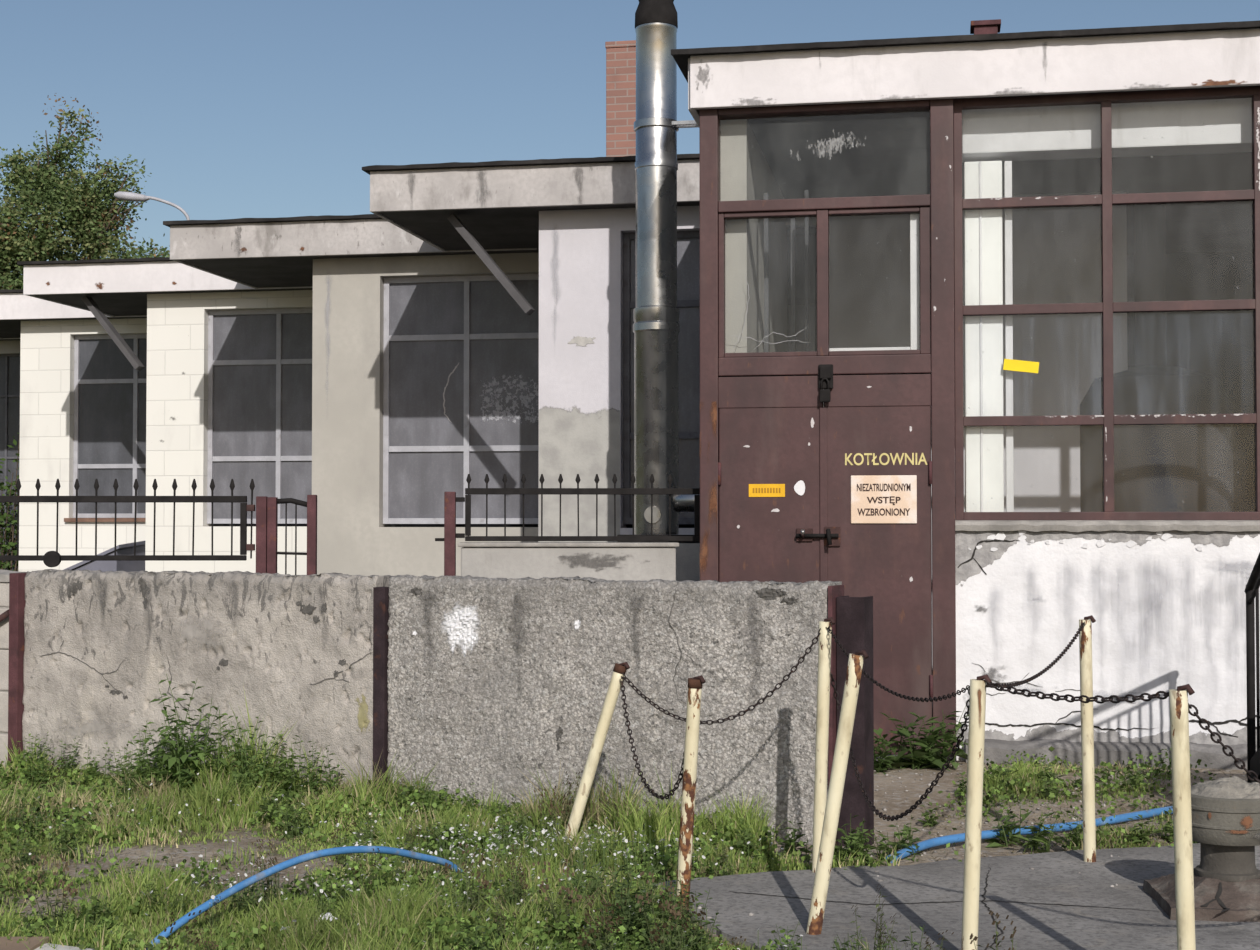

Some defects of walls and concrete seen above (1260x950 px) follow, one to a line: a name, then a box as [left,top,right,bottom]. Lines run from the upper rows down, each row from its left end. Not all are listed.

crack [958,540,1019,575]
peeling [956,530,1260,586]
crack [42,640,125,692]
crack [158,655,197,712]
peeling [985,724,1171,744]
peeling [1189,727,1257,745]